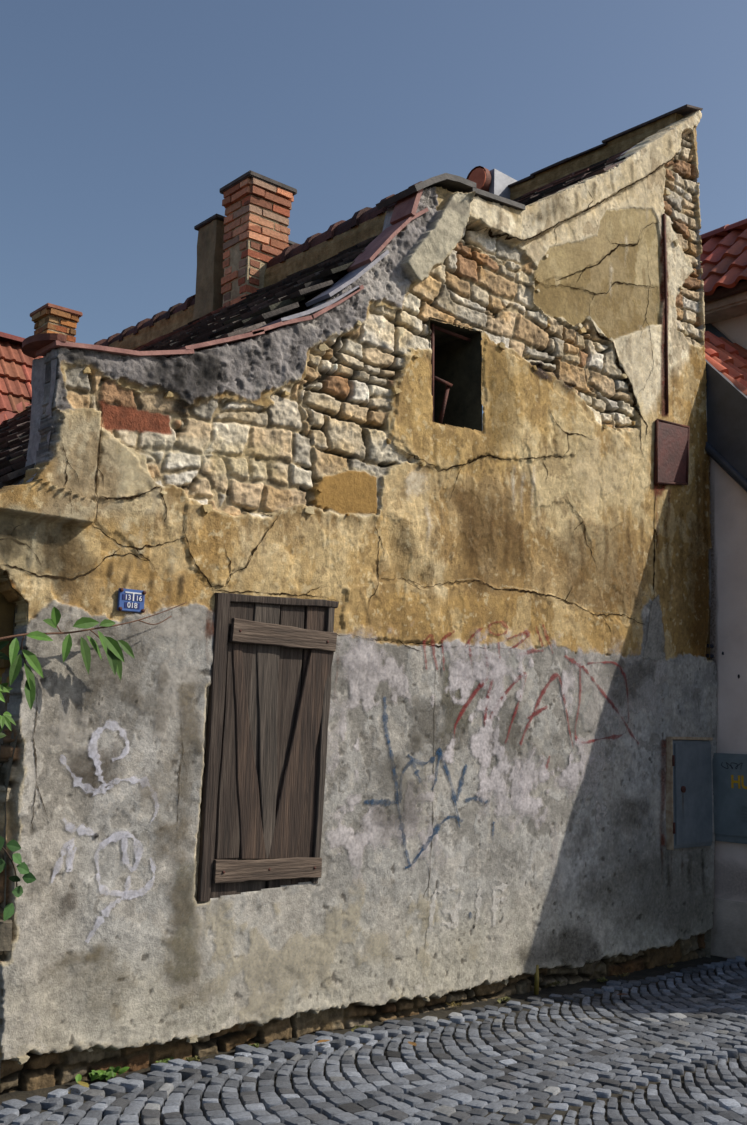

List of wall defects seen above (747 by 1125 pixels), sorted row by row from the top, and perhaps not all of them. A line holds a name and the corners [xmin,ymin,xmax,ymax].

flaking render [65,126,705,518]
crack [545,222,660,454]
crack [2,410,336,601]
crack [388,407,591,501]
crack [368,499,643,640]
crack [31,694,49,830]
crack [177,716,187,847]
crack [337,634,518,984]
flaking render [0,934,706,1093]